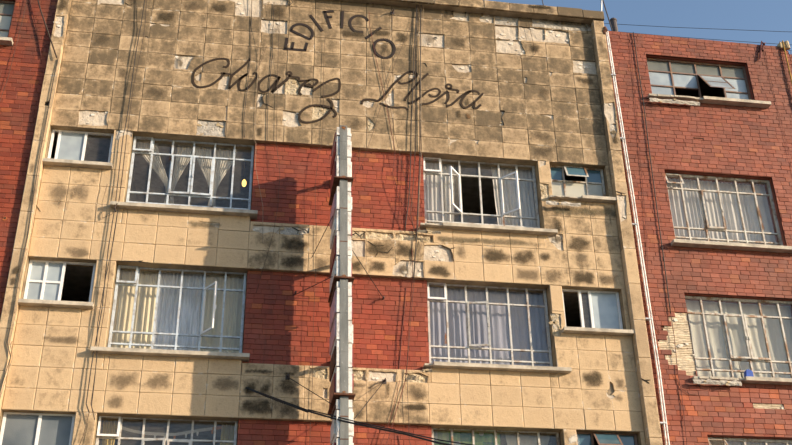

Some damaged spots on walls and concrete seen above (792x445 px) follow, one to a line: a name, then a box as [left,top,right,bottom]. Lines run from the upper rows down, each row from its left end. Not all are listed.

spalling [218,0,289,34]
spalling [451,12,469,21]
spalling [419,34,444,47]
spalling [479,15,591,55]
spalling [274,79,313,96]
spalling [196,106,227,137]
spalling [282,111,301,127]
spalling [312,100,340,120]
spalling [352,230,453,278]